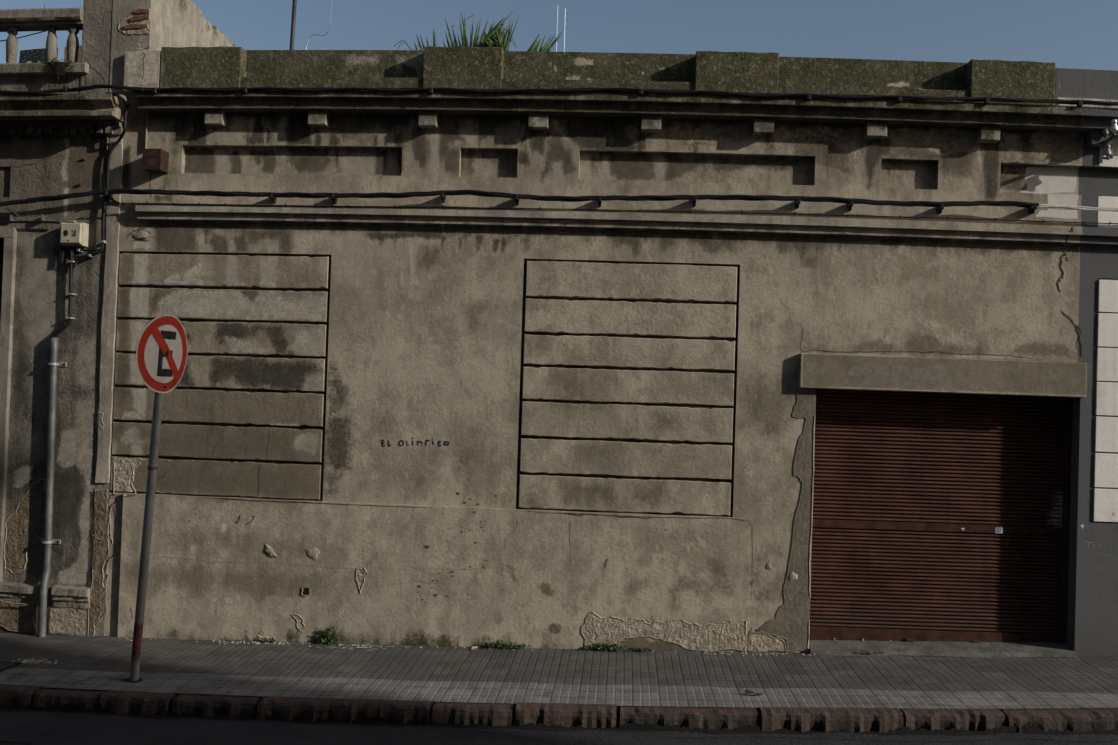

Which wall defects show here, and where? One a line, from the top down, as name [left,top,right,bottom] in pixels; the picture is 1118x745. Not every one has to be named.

peeling [118,8,158,87]
leakage [173,115,276,191]
leakage [285,114,488,191]
leakage [116,224,290,418]
crack [1057,226,1093,356]
leakage [209,322,350,492]
peeling [271,423,318,454]
peeling [848,353,987,392]
crack [793,325,1053,420]
peeling [0,339,147,636]
spalling [581,388,815,653]